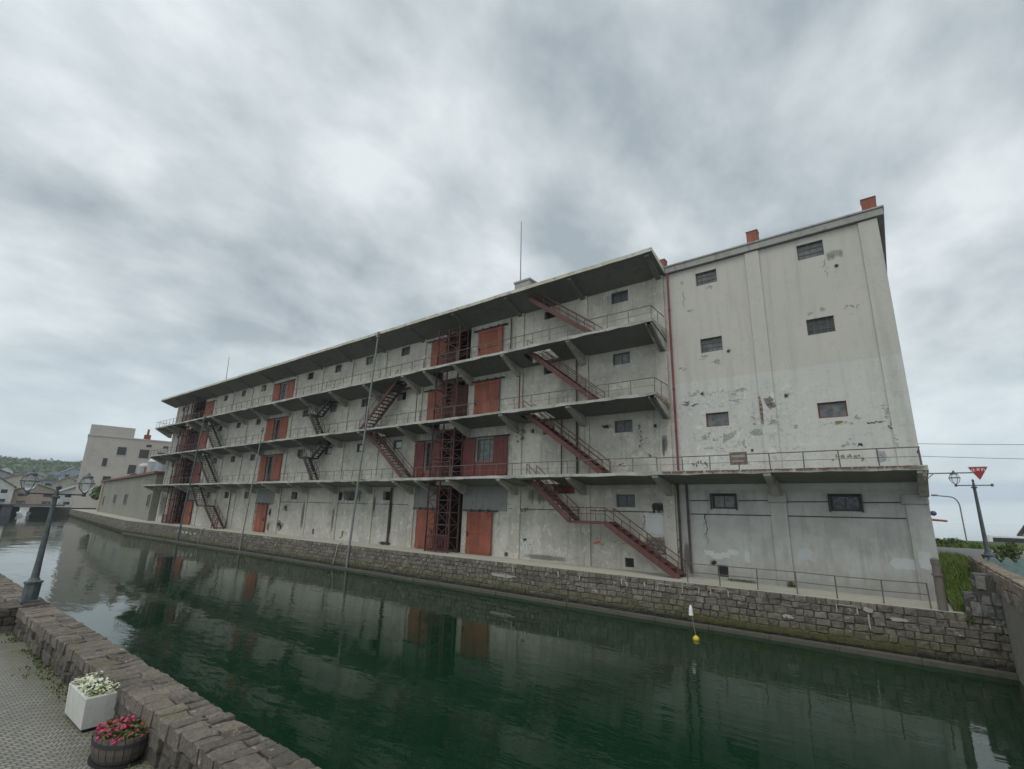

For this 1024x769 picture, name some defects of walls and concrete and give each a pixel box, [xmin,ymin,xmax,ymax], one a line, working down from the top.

spalling [660,388,745,408]
spalling [691,393,789,467]
peeling [832,405,899,463]